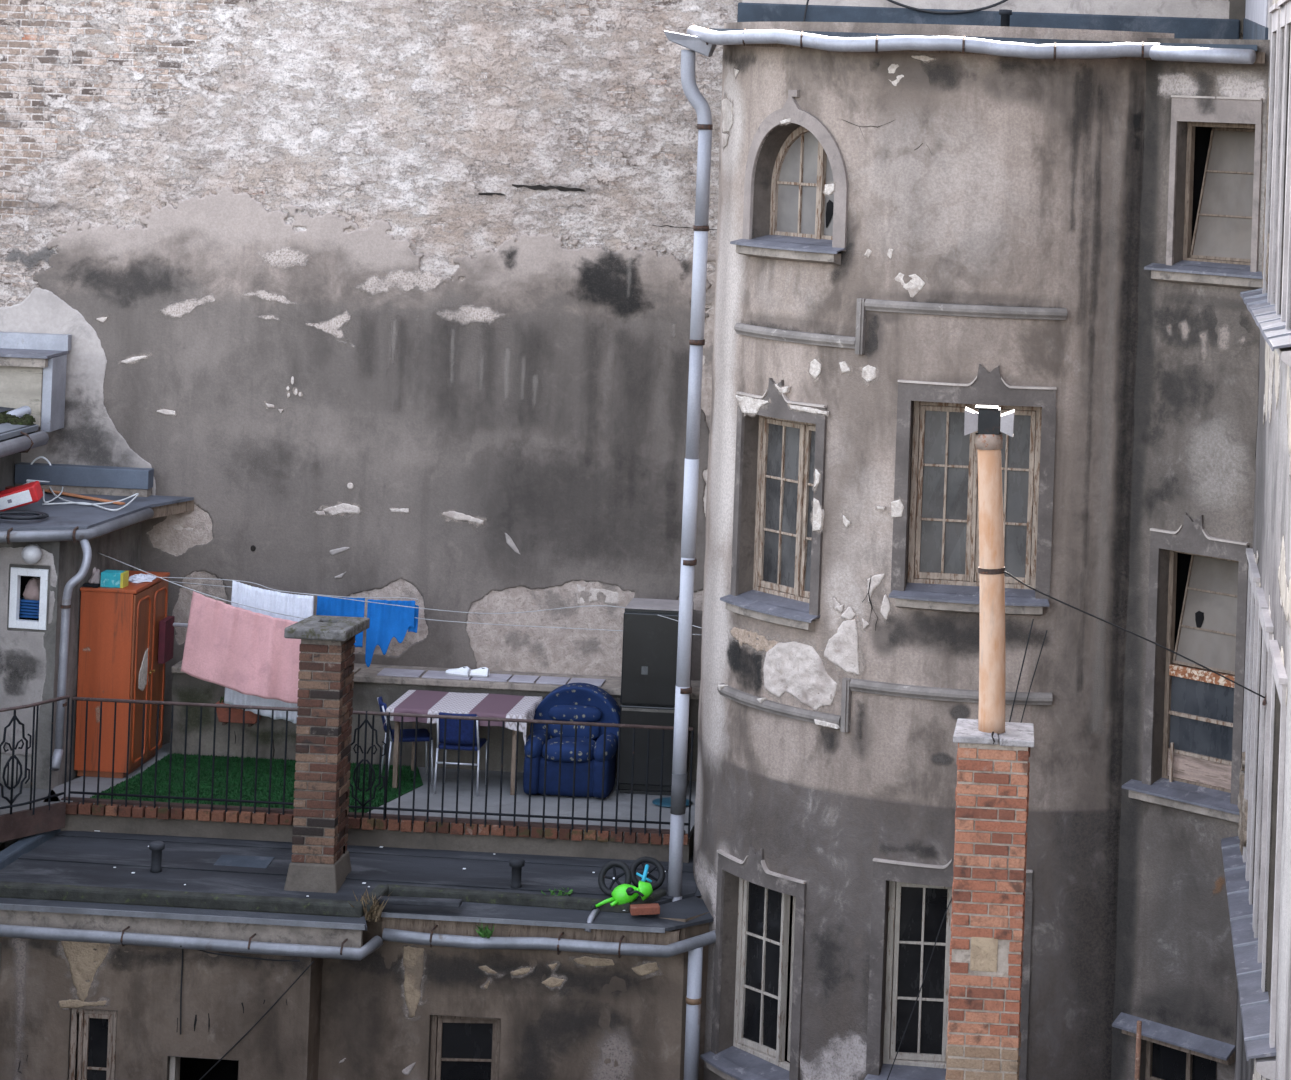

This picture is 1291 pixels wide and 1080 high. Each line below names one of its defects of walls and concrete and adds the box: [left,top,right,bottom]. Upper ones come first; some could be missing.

spalling [888,55,936,86]
spalling [0,0,742,431]
spalling [895,273,927,298]
spalling [809,357,821,381]
spalling [839,361,878,386]
spalling [736,384,829,416]
peeling [1263,342,1291,481]
spalling [811,469,824,532]
spalling [875,497,904,517]
peeling [1259,536,1291,629]
spalling [466,580,635,677]
spalling [479,956,614,989]